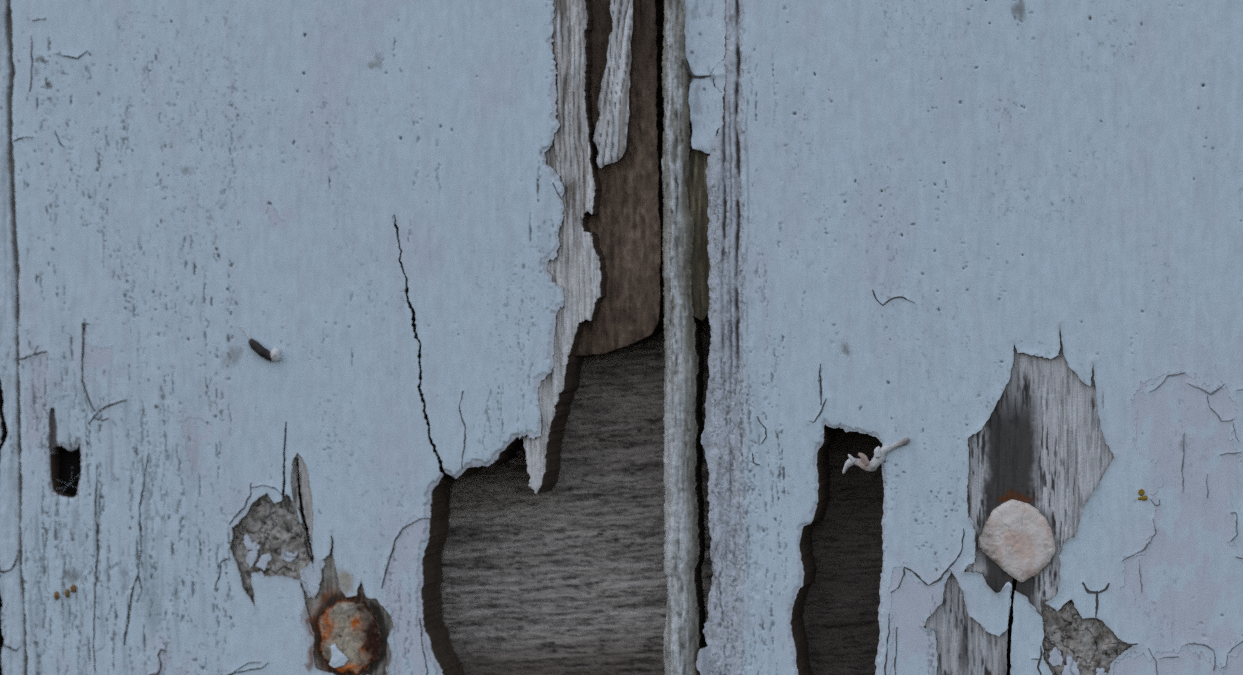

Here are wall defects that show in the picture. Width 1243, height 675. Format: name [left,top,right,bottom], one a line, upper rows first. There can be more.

crack [15,345,47,360]
crack [394,215,466,479]
peeling [888,331,1243,675]
crack [1082,372,1243,617]
crack [0,550,21,573]
peeling [232,454,452,675]
crack [0,604,21,675]
crack [1006,578,1042,675]
crack [1111,641,1243,675]